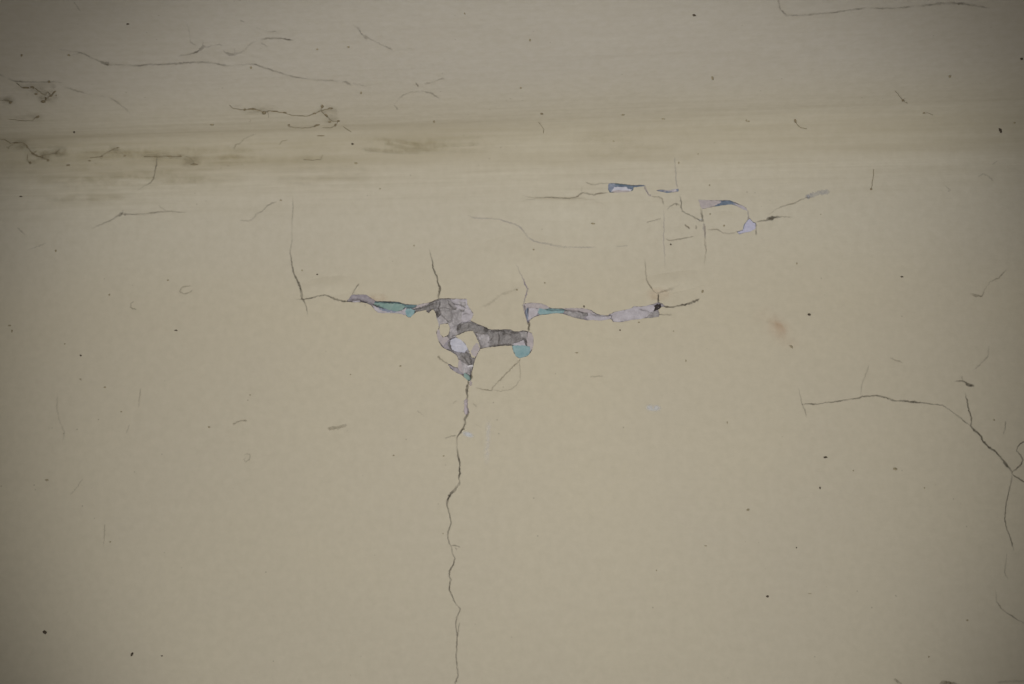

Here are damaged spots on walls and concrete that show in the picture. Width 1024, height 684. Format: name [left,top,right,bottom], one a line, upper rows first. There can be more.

peeling [608,183,644,193]
peeling [699,200,756,234]
flaking render [347,294,665,381]
crack [447,381,472,500]